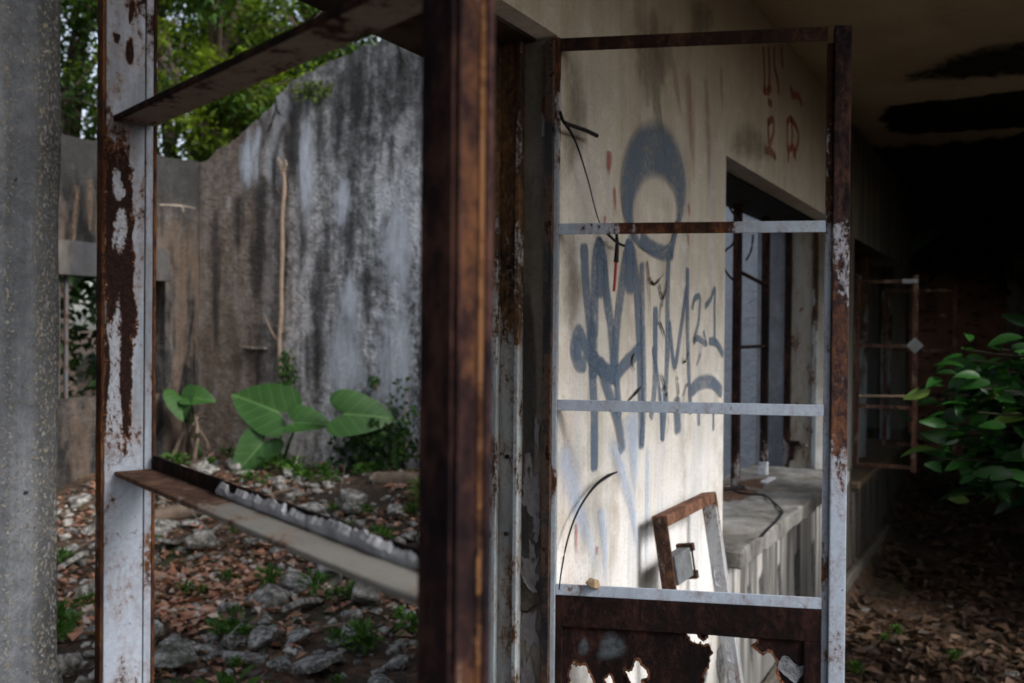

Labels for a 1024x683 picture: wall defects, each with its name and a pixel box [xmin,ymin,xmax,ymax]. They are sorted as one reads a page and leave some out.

water stain [336,66,373,151]
corrosion [102,129,139,461]
water stain [241,99,321,295]
water stain [305,255,372,390]
water stain [335,179,354,257]
water stain [380,311,411,408]
efflorescence [383,206,410,291]
peeling [520,417,541,683]